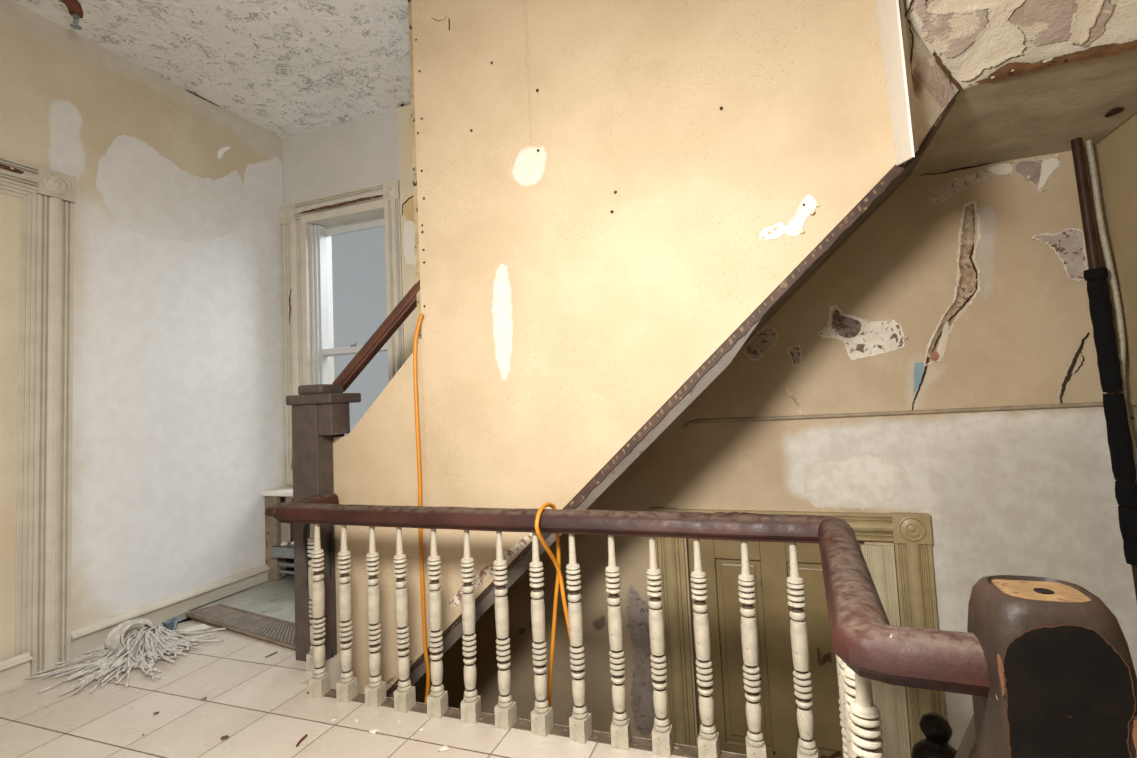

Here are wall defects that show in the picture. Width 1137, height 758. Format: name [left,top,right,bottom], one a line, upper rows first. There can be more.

flaking render [912,0,1114,108]
peeling [927,154,1062,206]
peeling [1031,228,1088,281]
spalling [564,163,908,509]
crack [1059,332,1089,404]
spalling [386,647,431,697]